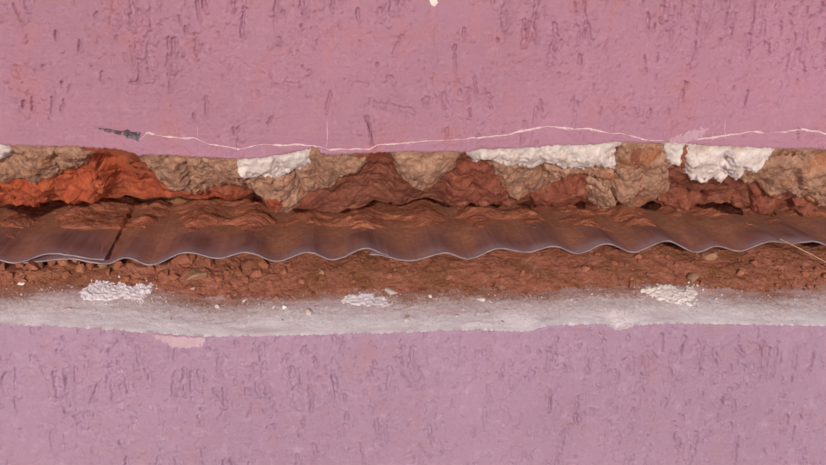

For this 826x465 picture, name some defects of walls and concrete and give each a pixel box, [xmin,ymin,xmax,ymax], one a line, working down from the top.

spalling [98,128,141,142]
crack [141,119,664,151]
crack [696,128,826,140]
spalling [0,144,99,185]
spalling [137,147,368,213]
spalling [389,142,826,210]